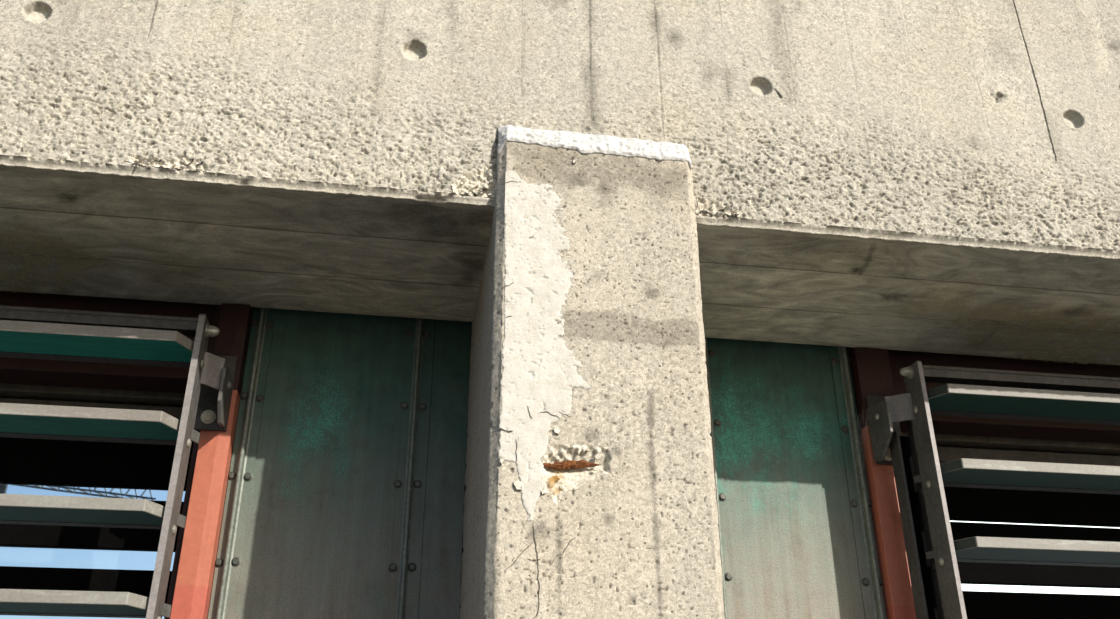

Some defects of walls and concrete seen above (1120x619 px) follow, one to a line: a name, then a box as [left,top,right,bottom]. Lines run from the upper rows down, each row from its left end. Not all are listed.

peeling [451,166,612,521]
crack [504,520,576,618]